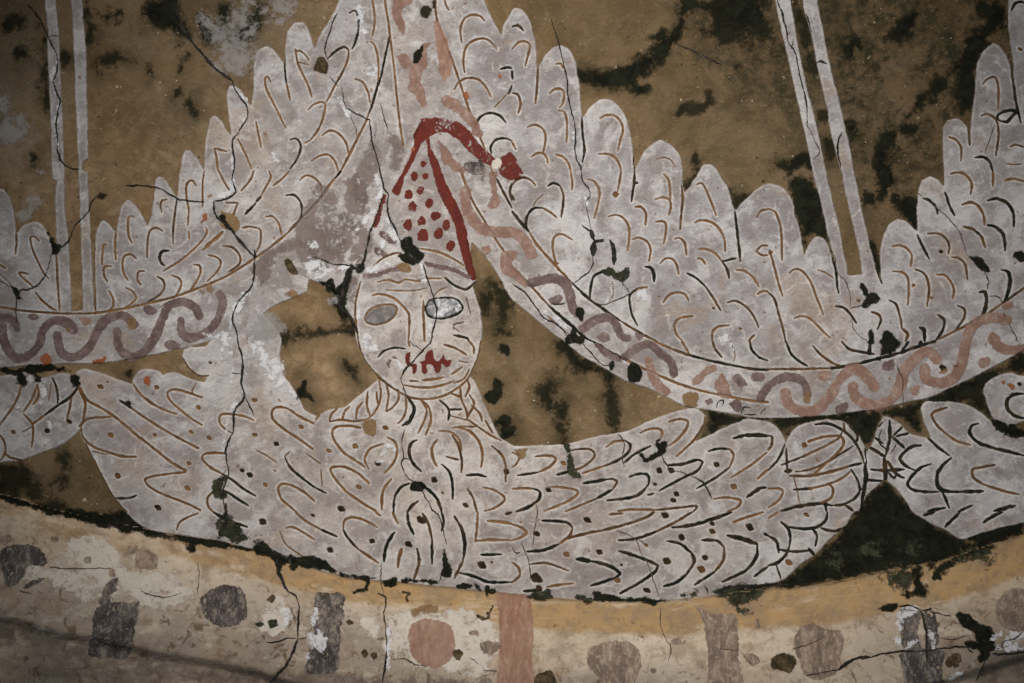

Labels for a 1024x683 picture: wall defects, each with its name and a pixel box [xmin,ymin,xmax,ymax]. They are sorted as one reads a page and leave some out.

water stain [200,0,296,75]
water stain [675,89,714,117]
crack [515,19,630,366]
water stain [729,188,749,208]
crack [126,0,256,536]
water stain [478,280,514,336]
crack [400,264,471,544]
peeling [22,536,194,613]
peeling [346,591,501,679]
spalling [534,670,557,683]
spalling [743,652,796,673]
crack [806,604,1024,681]